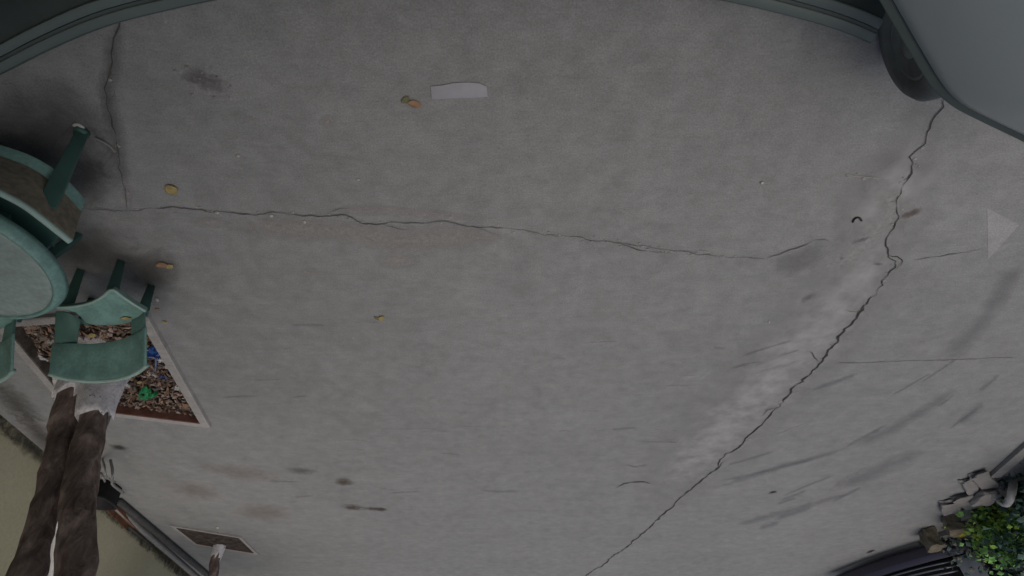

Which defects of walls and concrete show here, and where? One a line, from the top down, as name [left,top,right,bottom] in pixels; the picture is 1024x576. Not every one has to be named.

crack [86,23,832,259]
crack [586,99,981,576]